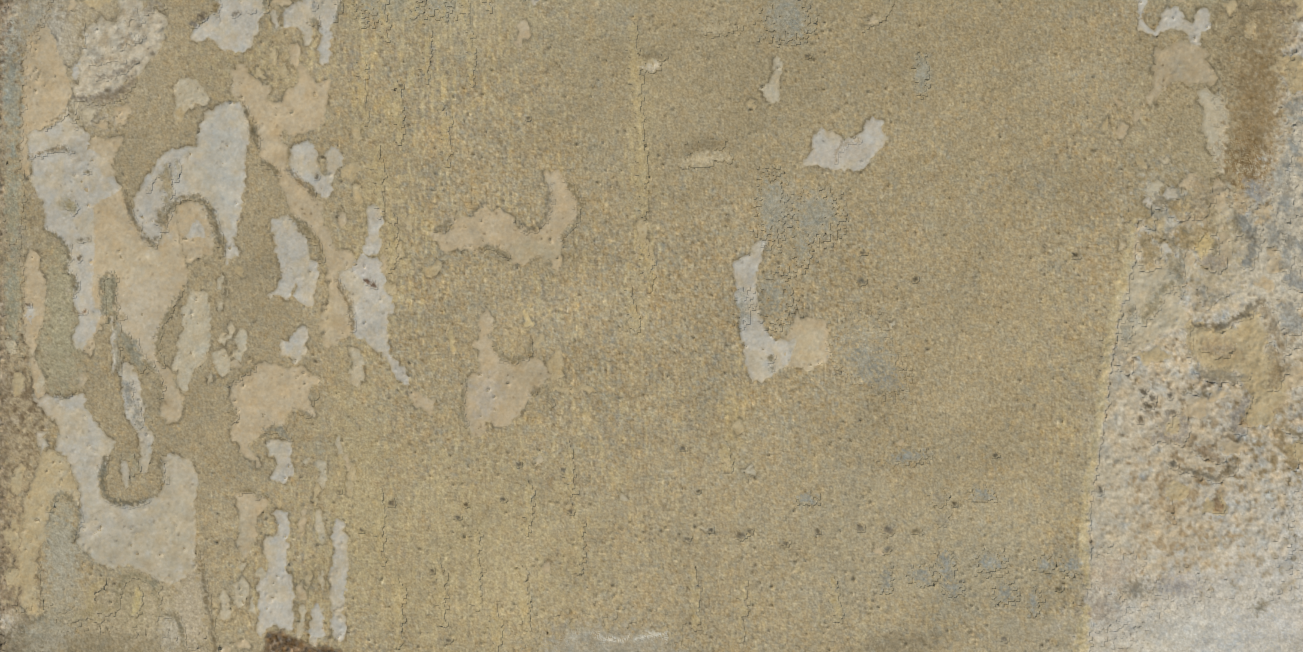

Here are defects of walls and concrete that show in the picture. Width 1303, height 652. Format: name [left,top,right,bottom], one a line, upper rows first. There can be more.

peeling [802,116,889,172]
peeling [3,0,596,652]
peeling [732,240,831,383]